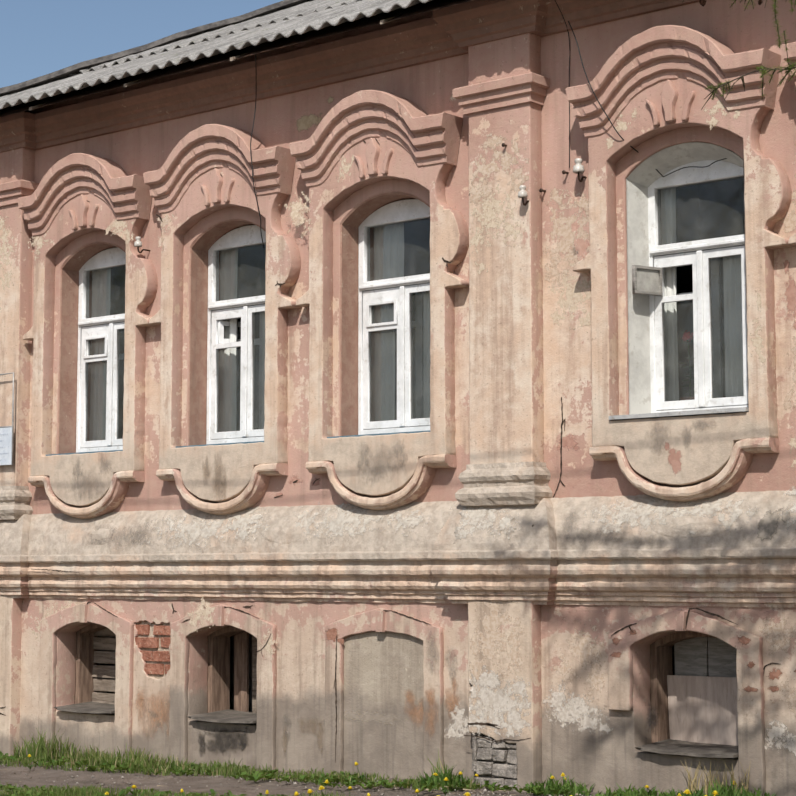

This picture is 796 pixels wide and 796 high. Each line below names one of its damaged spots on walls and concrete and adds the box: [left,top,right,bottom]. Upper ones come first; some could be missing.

peeling [285,191,311,238]
peeling [469,133,529,274]
crack [553,397,565,498]
peeling [665,443,681,474]
crack [224,605,259,619]
crack [685,608,738,629]
spalling [135,621,171,679]
spalling [472,733,517,792]